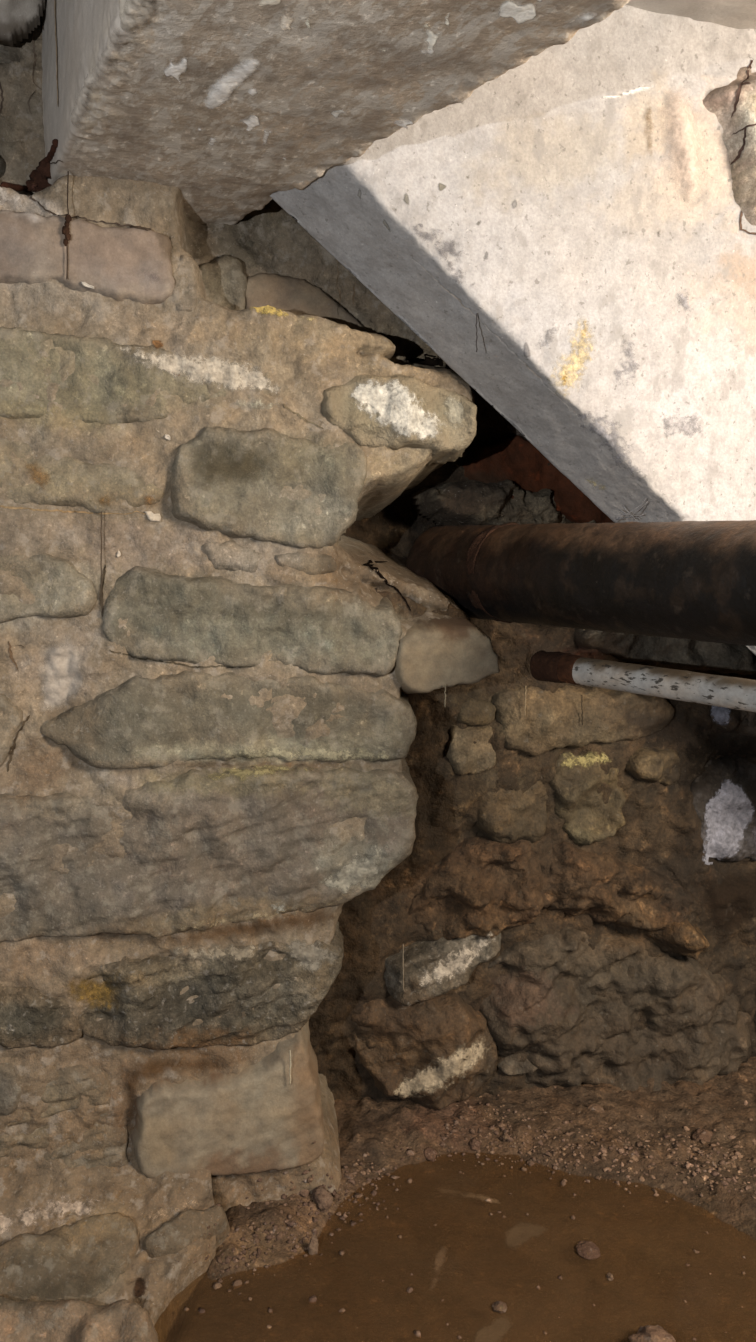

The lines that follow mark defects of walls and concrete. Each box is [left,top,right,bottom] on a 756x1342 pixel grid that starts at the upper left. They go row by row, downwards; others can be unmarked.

crack [0,22,44,114]
crack [730,60,756,165]
corrosion [0,139,58,192]
crack [23,193,151,231]
crack [739,211,756,235]